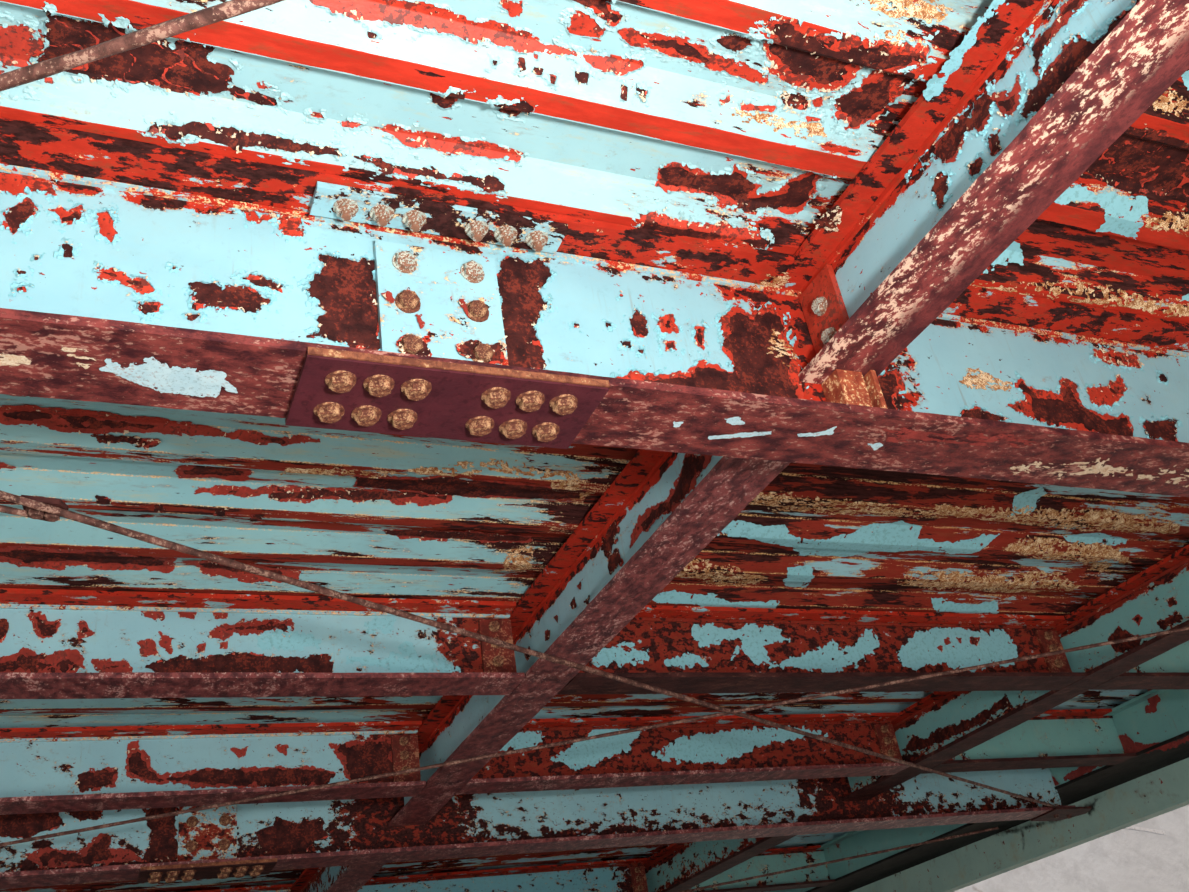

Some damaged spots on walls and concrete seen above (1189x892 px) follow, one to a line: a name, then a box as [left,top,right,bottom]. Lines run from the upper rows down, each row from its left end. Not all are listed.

rust [25,1,136,65]
rust [55,38,509,201]
peeling [304,0,1009,145]
rust [905,0,1140,212]
peeling [631,160,837,250]
peeling [61,345,238,398]
rust [126,246,381,351]
rust [456,253,583,369]
peeling [609,300,812,399]
peeling [174,465,586,509]
peeling [0,606,295,673]
rust [138,652,335,673]